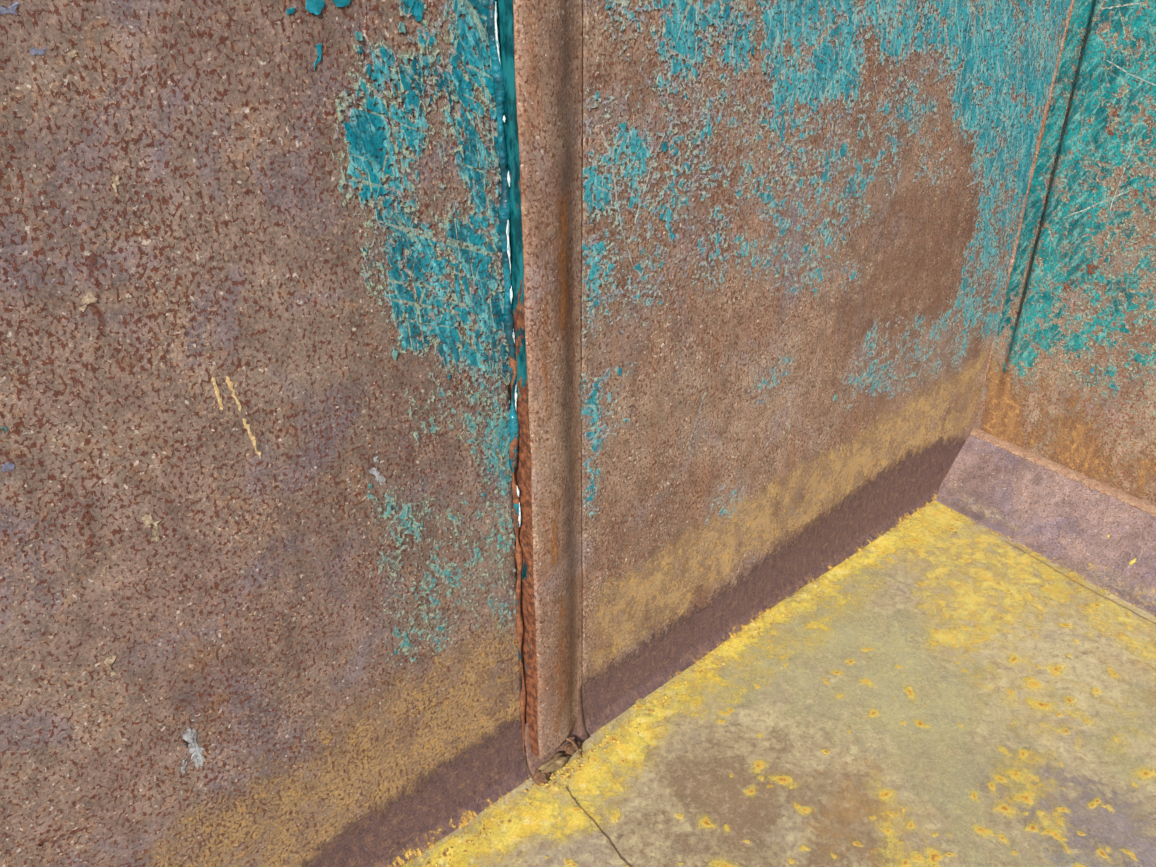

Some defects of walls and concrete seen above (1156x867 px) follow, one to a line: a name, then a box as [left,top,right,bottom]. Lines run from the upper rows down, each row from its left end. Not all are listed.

peeling [331,0,518,666]
peeling [581,360,637,524]
peeling [704,469,745,526]
peeling [581,0,1156,419]
corrosion [592,352,1156,669]
corrosion [1062,257,1098,293]
corrosion [153,623,522,867]
crack [565,786,631,867]
corrosion [376,493,1156,867]